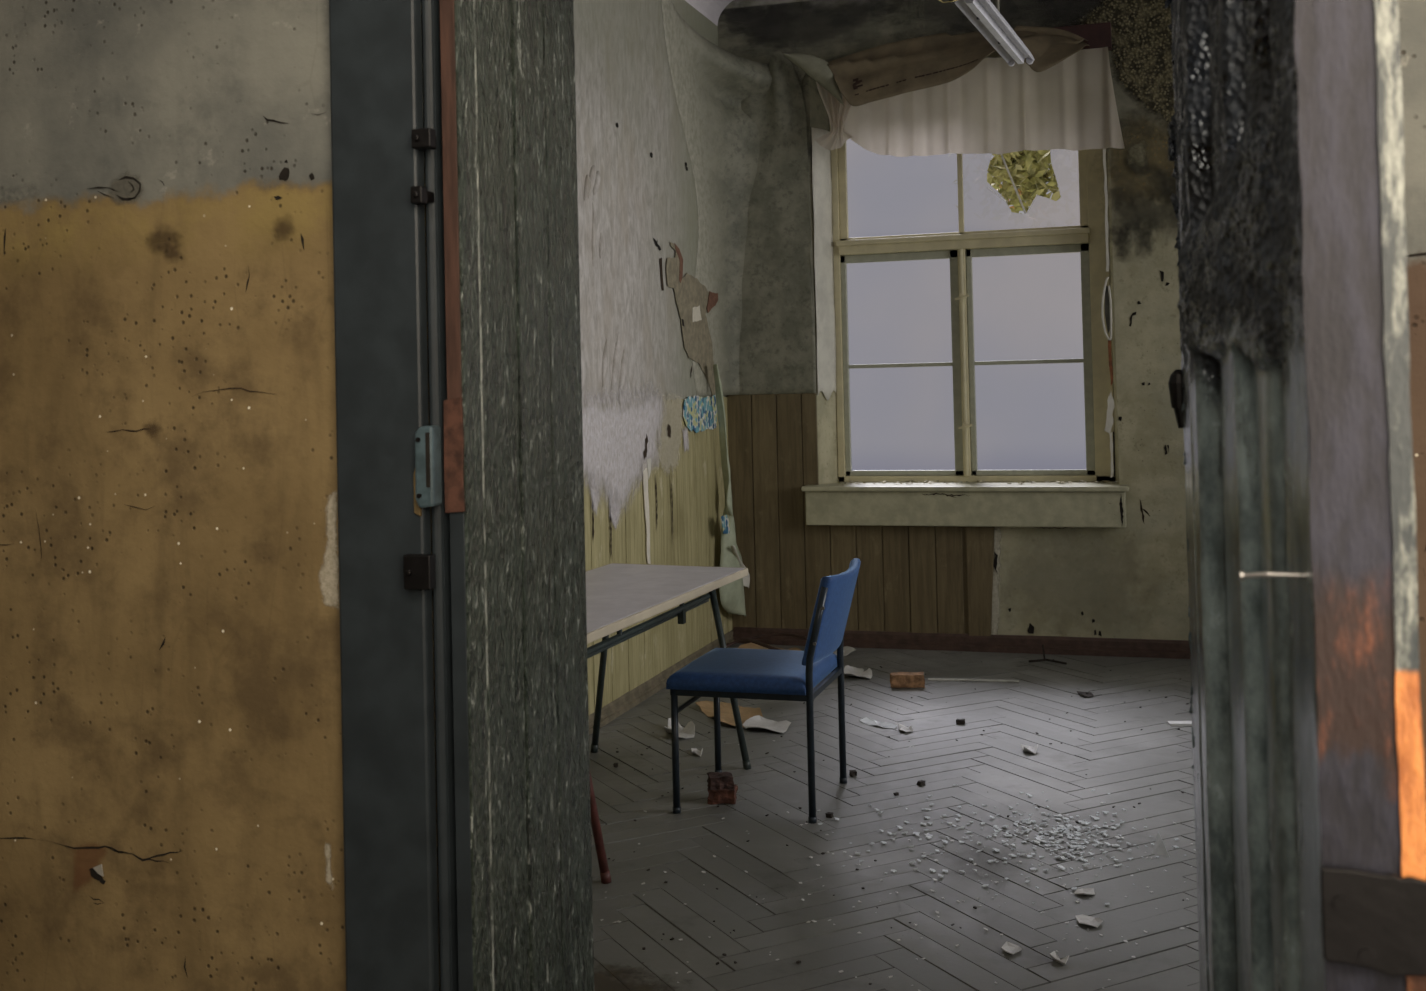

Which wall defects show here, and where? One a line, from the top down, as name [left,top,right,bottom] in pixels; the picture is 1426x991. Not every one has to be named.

peeling [582,393,689,564]
peeling [320,492,339,607]
flaking render [991,528,1011,635]
crack [0,837,181,863]